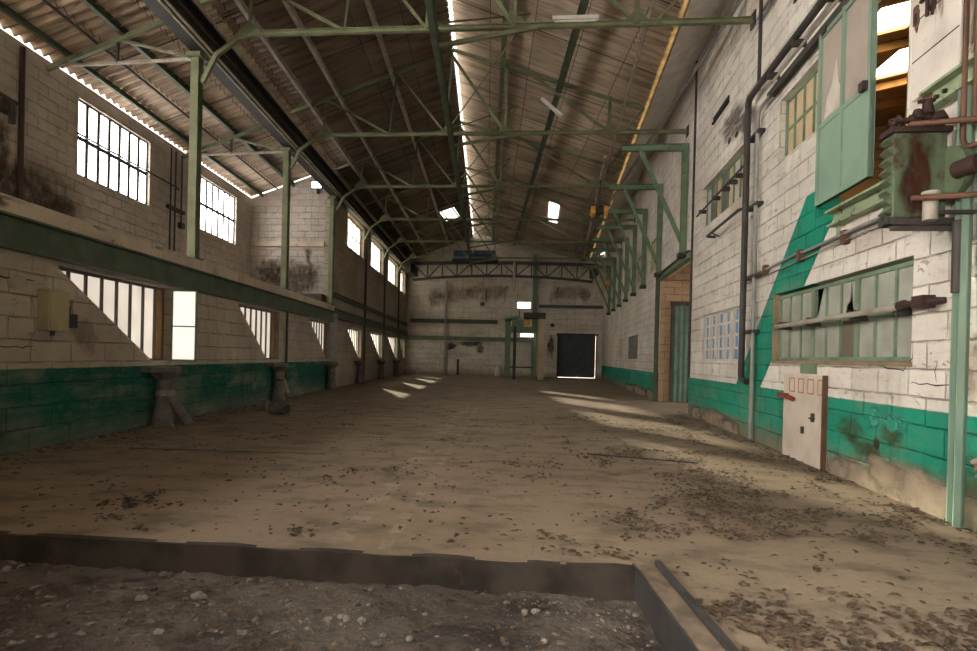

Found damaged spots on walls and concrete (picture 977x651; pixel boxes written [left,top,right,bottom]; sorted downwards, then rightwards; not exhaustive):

rust [900,136,931,211]
crack [0,275,36,348]
peeling [828,408,946,520]